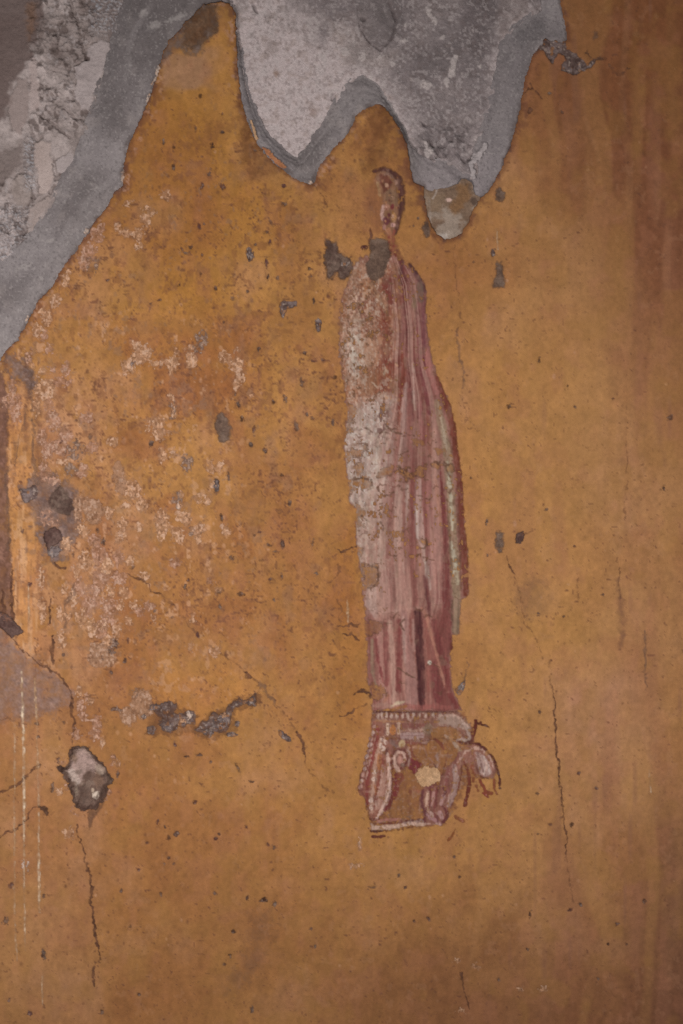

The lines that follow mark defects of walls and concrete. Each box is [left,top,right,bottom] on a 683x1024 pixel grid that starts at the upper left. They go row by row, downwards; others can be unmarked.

flaking render [0,0,610,674]
spalling [71,686,257,778]
crack [553,697,567,855]
crack [76,824,100,987]